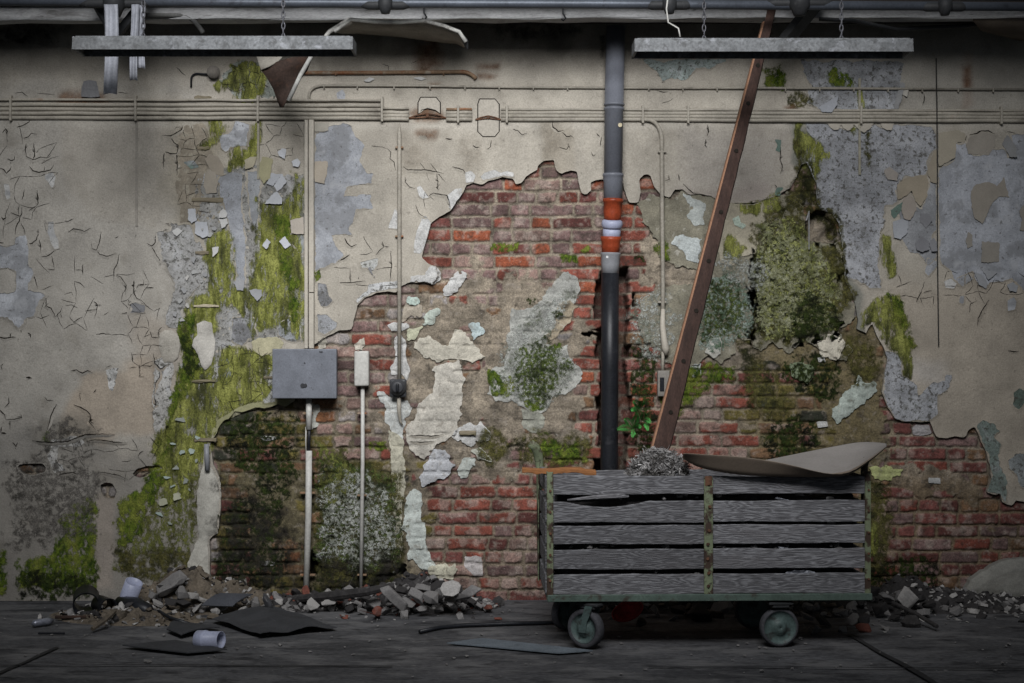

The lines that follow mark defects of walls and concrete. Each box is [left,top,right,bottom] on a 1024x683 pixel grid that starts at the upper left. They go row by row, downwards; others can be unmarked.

crack [0,121,209,481]
crack [334,236,395,286]
flaking render [150,120,604,600]
crack [375,129,526,219]
flaking render [618,175,697,470]
flaking render [669,59,1024,590]
crack [897,270,1024,325]